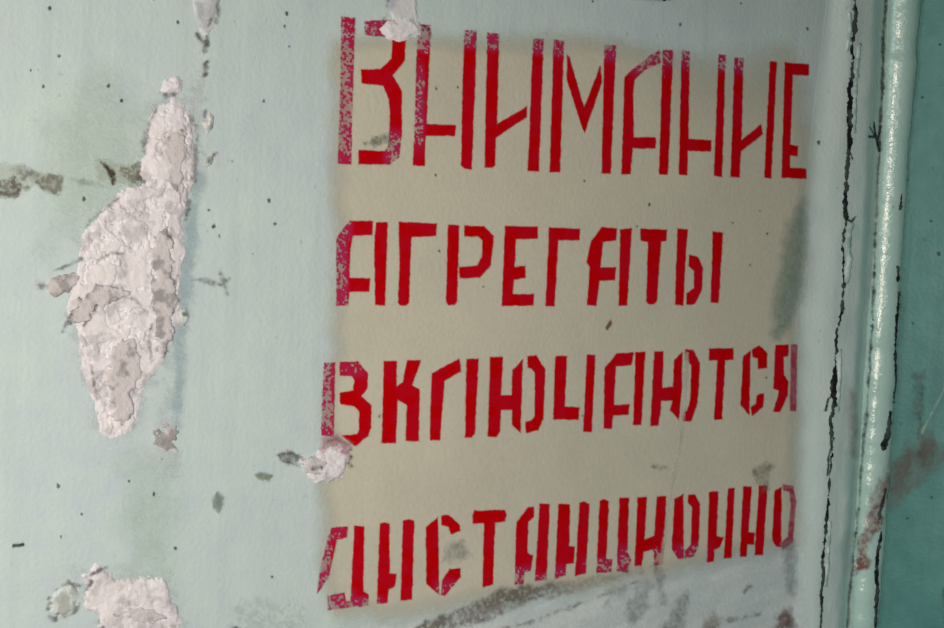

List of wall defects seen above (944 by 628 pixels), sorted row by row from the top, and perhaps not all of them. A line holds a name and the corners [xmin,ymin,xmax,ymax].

peeling [193,0,220,77]
peeling [379,0,429,42]
flaking render [39,76,214,439]
crack [819,0,900,628]
flaking render [151,422,179,460]
flaking render [278,436,352,484]
flaking render [48,563,186,628]